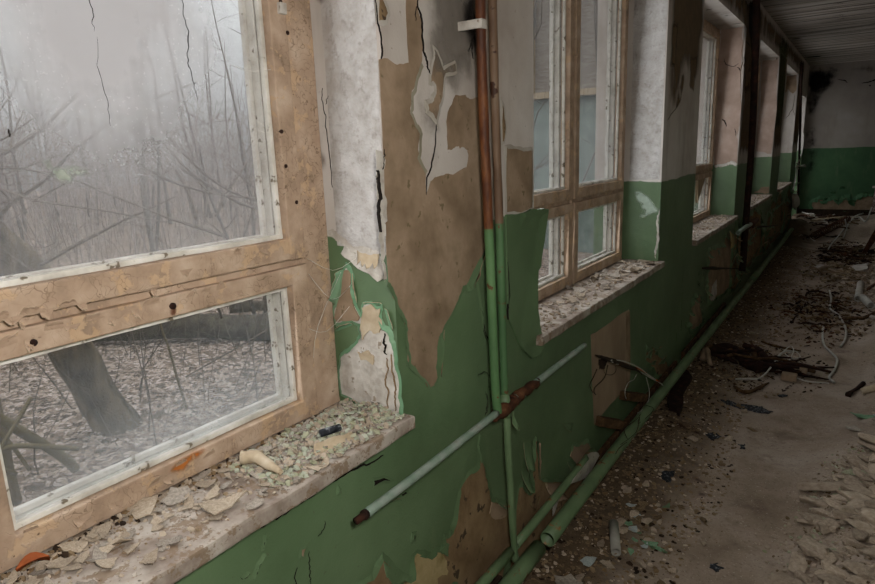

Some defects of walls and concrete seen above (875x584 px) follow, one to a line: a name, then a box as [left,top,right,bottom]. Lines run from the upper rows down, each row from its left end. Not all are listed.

crack [415,0,431,74]
water stain [671,0,711,107]
water stain [726,0,834,151]
peeling [327,0,485,415]
crack [426,124,437,195]
flaking render [591,310,631,425]
peeling [355,436,591,584]